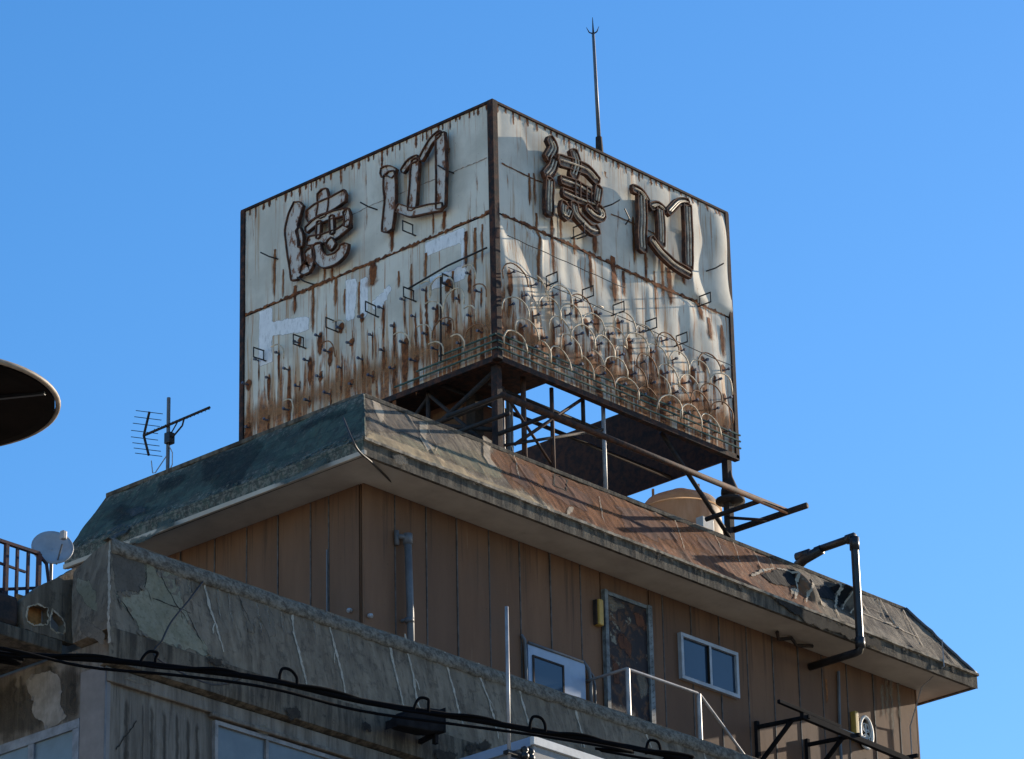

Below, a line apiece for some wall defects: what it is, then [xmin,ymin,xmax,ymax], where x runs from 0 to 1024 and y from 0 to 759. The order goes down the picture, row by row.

spalling [762,569,798,586]
crack [107,539,224,652]
spalling [816,584,853,607]
spalling [25,603,66,634]
peeling [26,671,66,729]